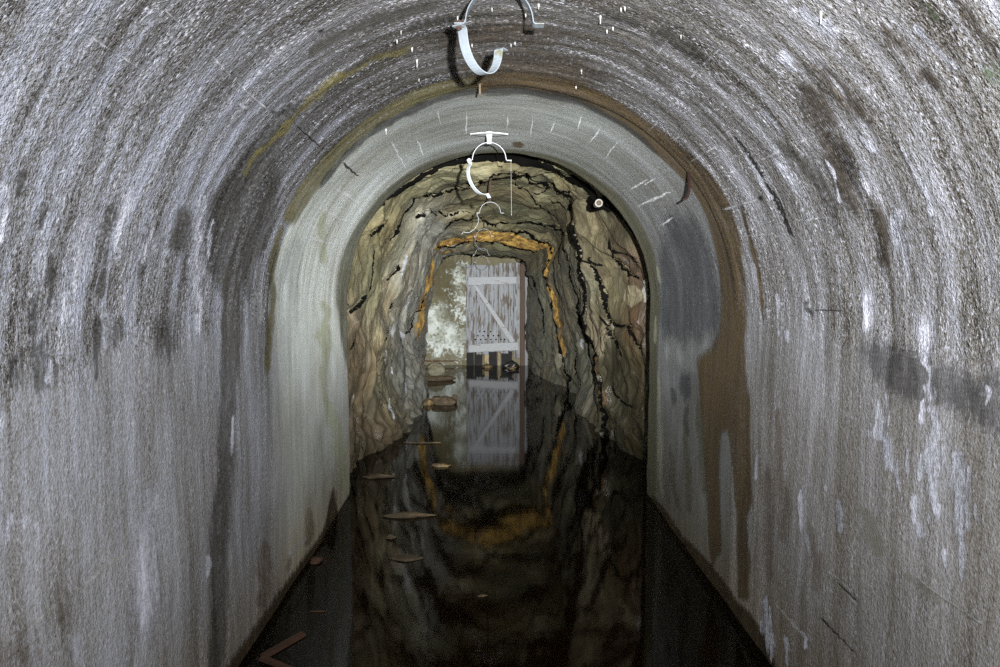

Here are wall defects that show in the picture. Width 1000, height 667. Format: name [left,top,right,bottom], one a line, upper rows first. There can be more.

leakage [169,3,603,667]
corrosion [471,69,764,599]
leakage [862,292,876,332]
leakage [861,315,992,581]